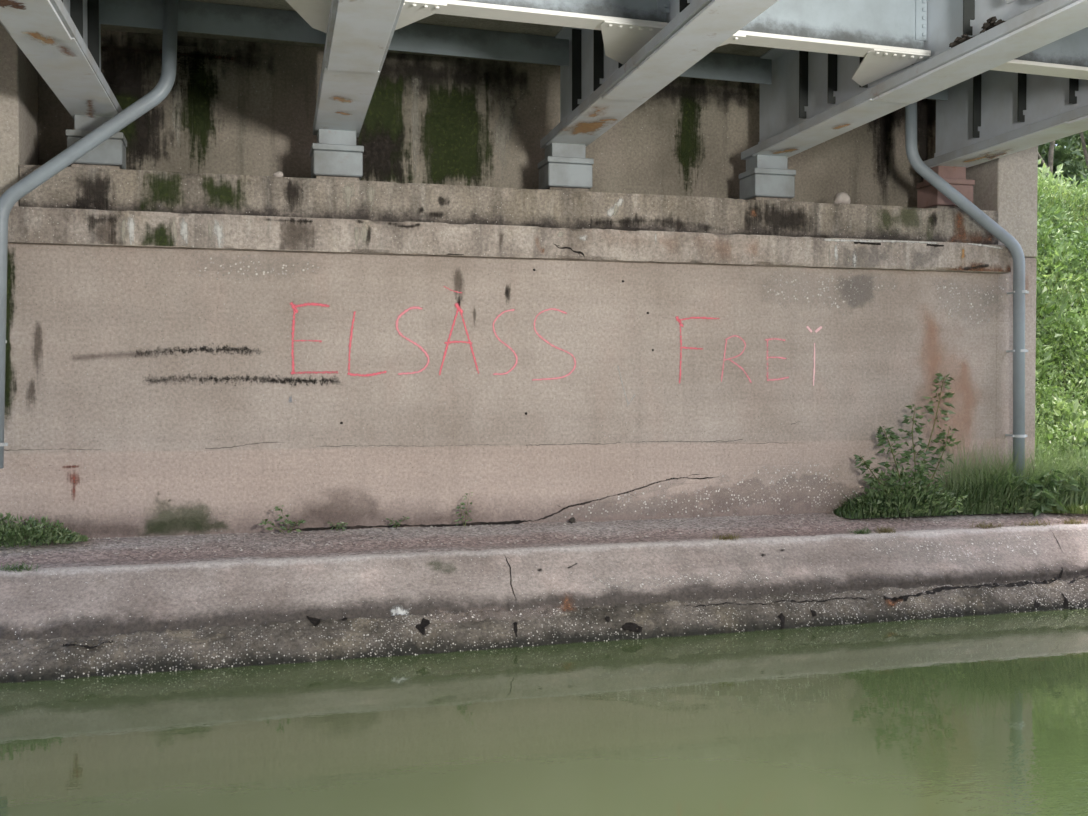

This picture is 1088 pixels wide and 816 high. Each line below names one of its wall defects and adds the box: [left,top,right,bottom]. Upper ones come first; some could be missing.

rust [0,0,26,10]
leakage [343,55,527,206]
rust [565,107,617,135]
leakage [656,78,758,175]
leakage [389,197,449,228]
leakage [745,203,811,236]
crack [205,441,284,449]
crack [526,422,797,446]
crack [281,474,719,531]